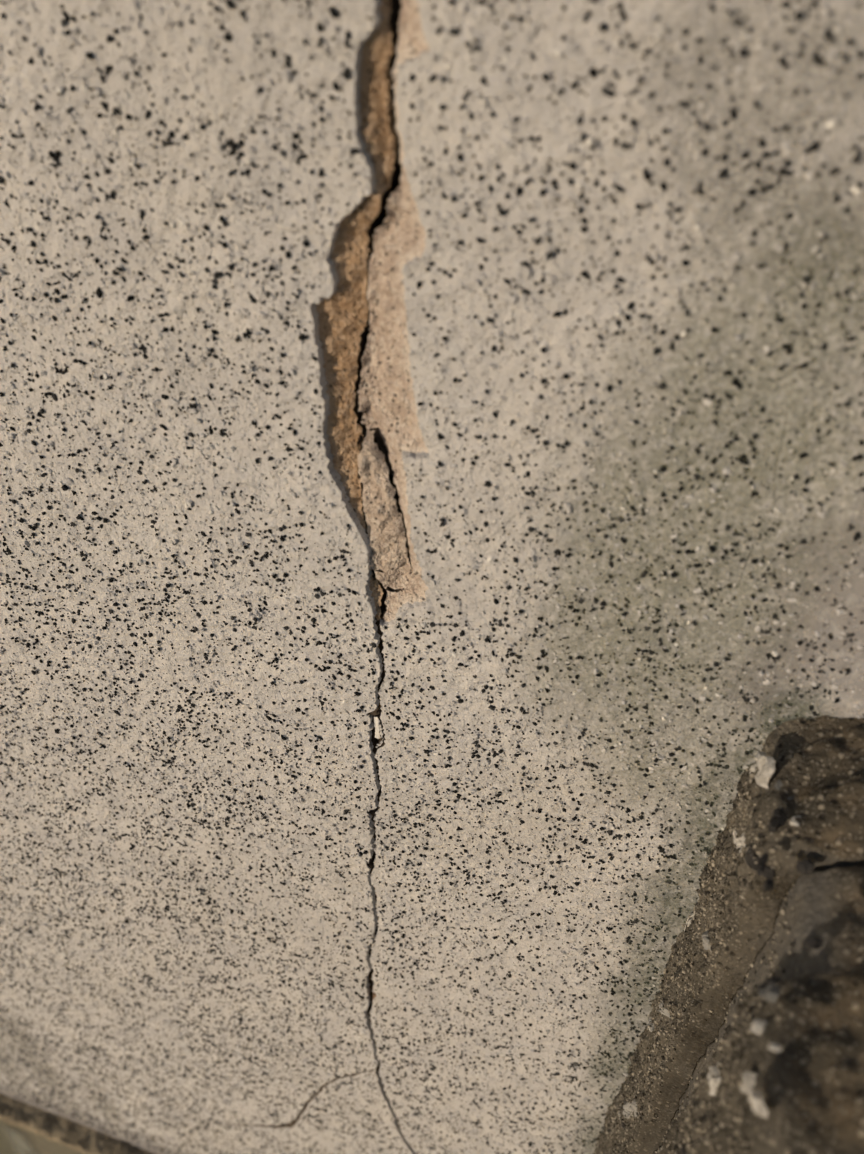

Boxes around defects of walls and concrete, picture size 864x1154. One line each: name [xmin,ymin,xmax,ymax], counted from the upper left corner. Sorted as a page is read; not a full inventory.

flaking render [316,0,429,625]
crack [213,605,414,1151]